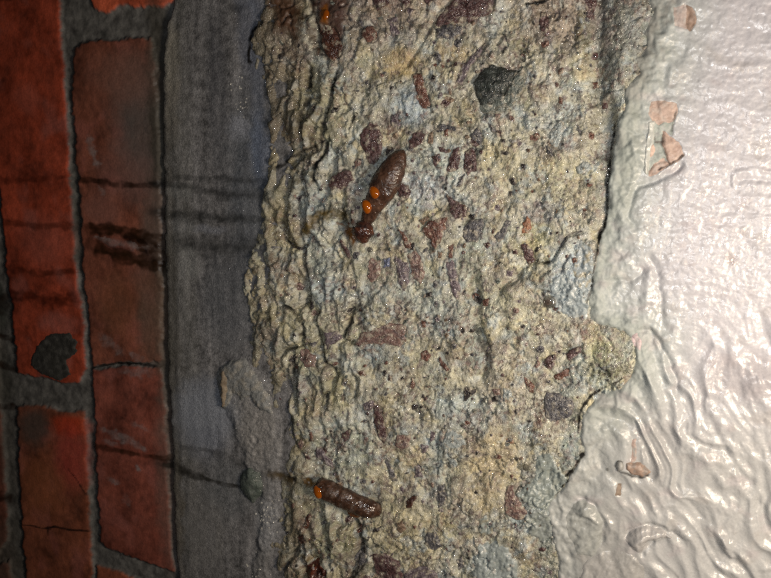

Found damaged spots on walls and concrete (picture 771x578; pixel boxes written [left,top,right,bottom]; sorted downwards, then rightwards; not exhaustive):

spalling [243,0,654,578]
crack [92,361,156,369]
crack [577,378,623,429]